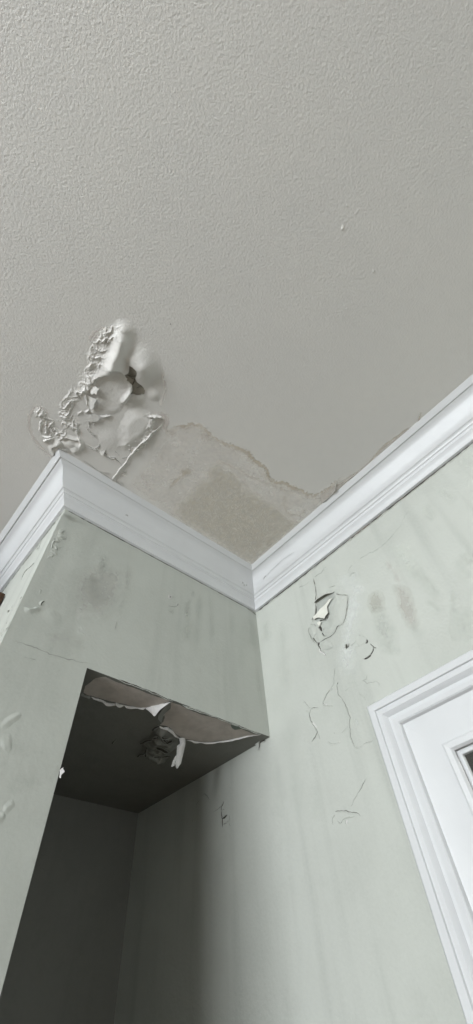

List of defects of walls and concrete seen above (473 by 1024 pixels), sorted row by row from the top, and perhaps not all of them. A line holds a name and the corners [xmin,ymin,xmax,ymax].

water stain [170,443,293,562]
peeling [307,578,377,661]
peeling [81,677,266,769]
crack [303,668,374,749]
crack [331,778,366,825]